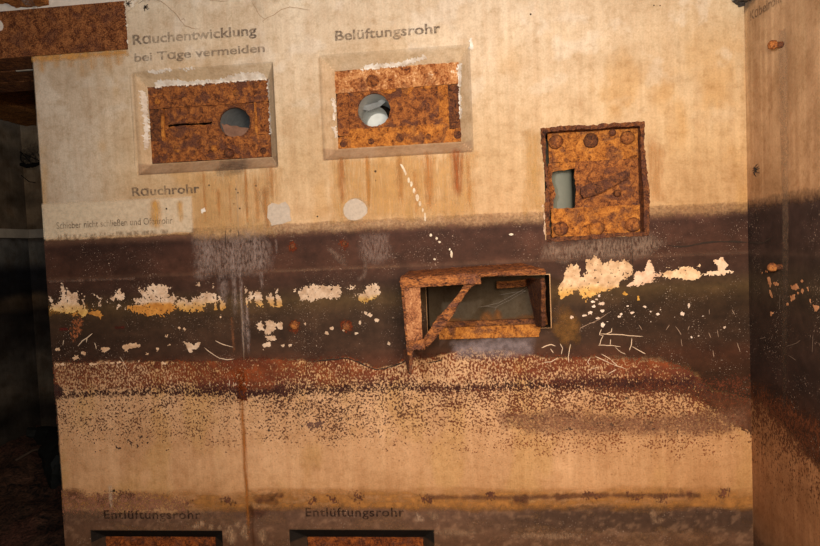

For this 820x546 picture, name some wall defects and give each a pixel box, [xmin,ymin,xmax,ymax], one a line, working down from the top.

corrosion [336,151,471,216]
water stain [44,194,820,466]
peeling [786,279,819,312]
corrosion [53,344,820,523]